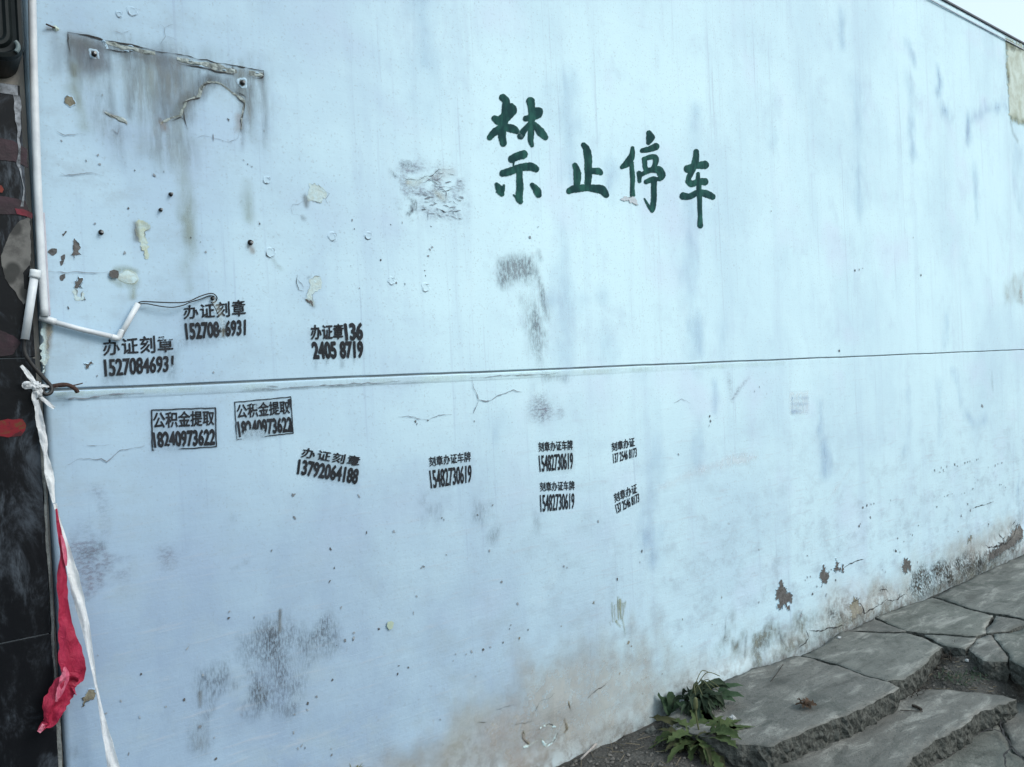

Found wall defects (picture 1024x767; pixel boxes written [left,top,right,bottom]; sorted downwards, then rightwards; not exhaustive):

peeling [64,95,76,108]
flaking render [67,32,264,141]
peeling [1006,39,1024,125]
peeling [407,169,462,227]
peeling [48,231,86,309]
crack [403,374,550,420]
crack [68,444,136,465]
peeling [775,579,802,617]
peeling [805,558,844,596]
peeling [895,538,918,574]
damp [909,555,996,596]
damp [755,613,805,665]